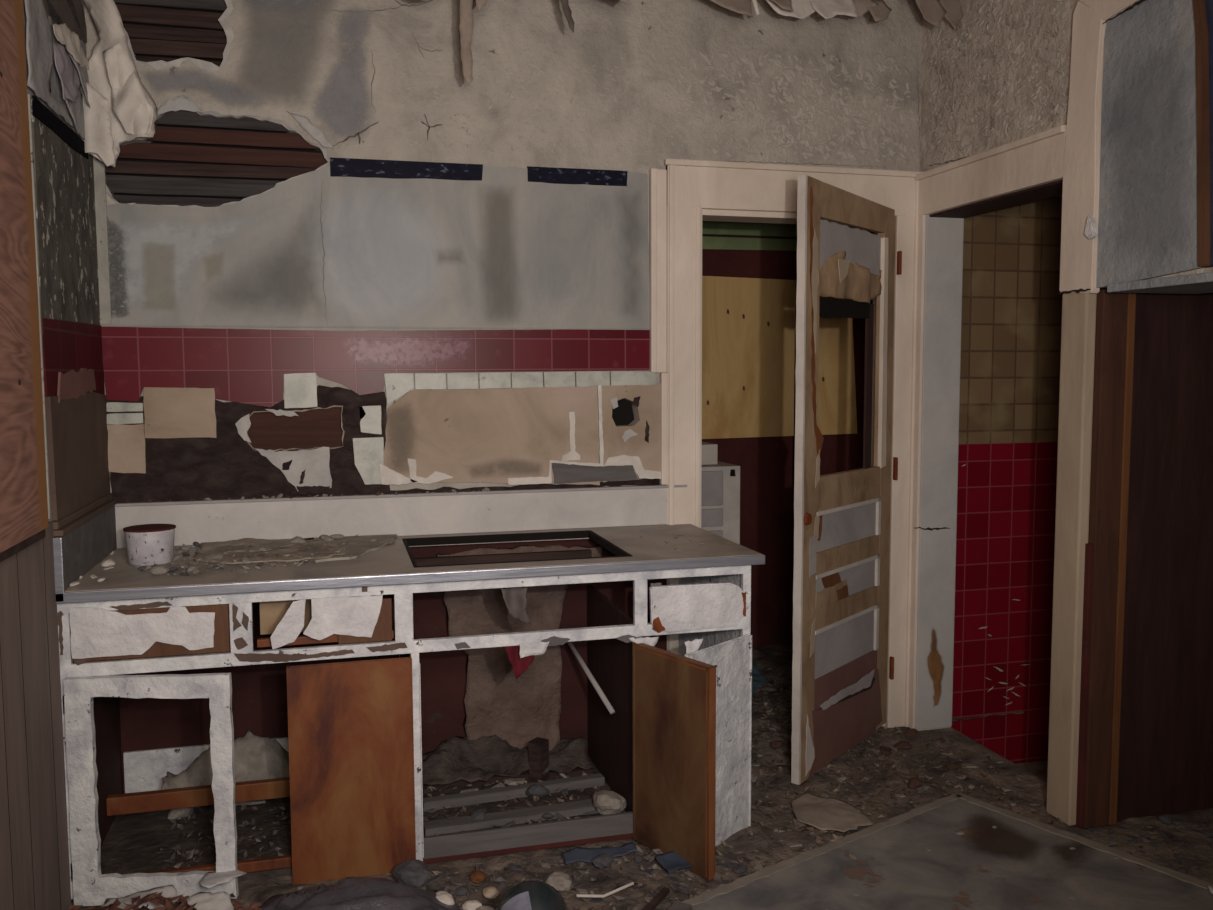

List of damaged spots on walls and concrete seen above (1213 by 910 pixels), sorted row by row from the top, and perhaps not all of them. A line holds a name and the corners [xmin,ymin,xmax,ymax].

flaking render [24,0,87,140]
flaking render [113,0,234,71]
peeling [459,0,487,85]
peeling [560,0,574,33]
peeling [710,0,892,22]
peeling [915,0,963,29]
flaking render [105,96,333,208]
peeling [57,368,660,503]
crack [914,525,950,533]
rust [928,630,944,705]
leakage [975,818,1034,858]